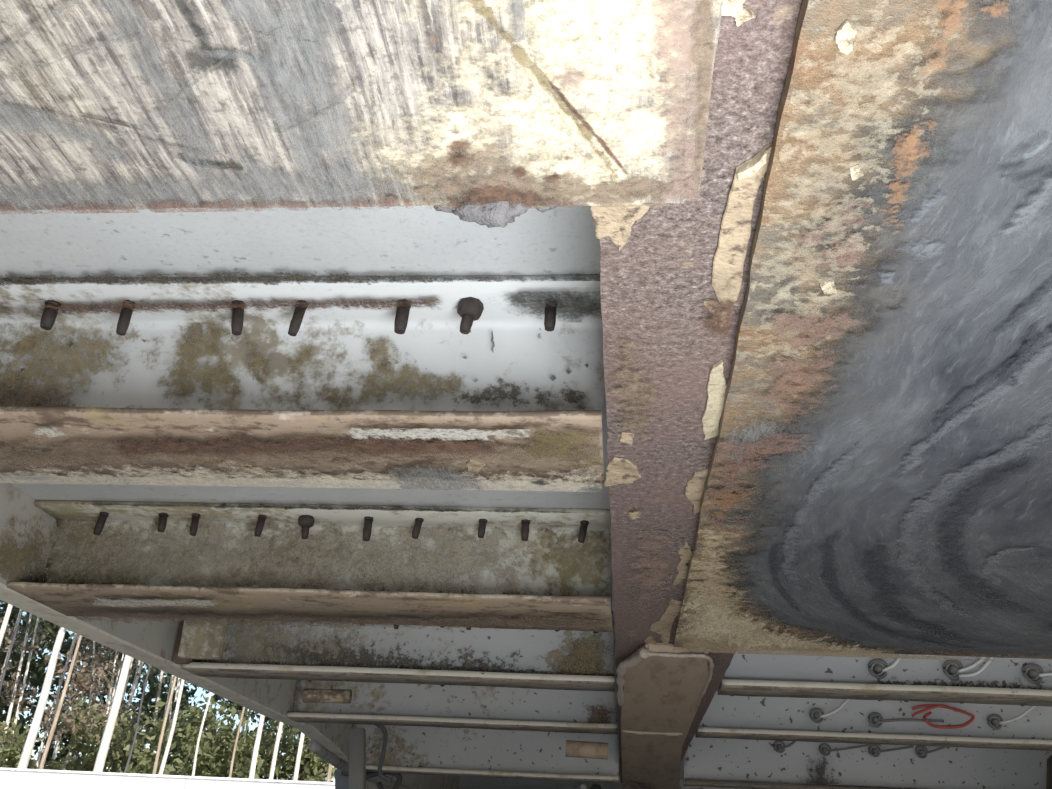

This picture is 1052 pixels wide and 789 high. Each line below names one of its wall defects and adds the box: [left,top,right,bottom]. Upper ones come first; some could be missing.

peeling [703,145,772,336]
rust [795,201,870,266]
rust [885,122,934,226]
leakage [1003,179,1052,234]
leakage [454,370,586,411]
peeling [702,359,727,440]
rust [761,313,858,414]
leakage [902,327,1052,473]
peeling [685,468,709,515]
rust [703,433,812,530]
leakage [769,444,861,612]
leakage [820,418,1052,650]